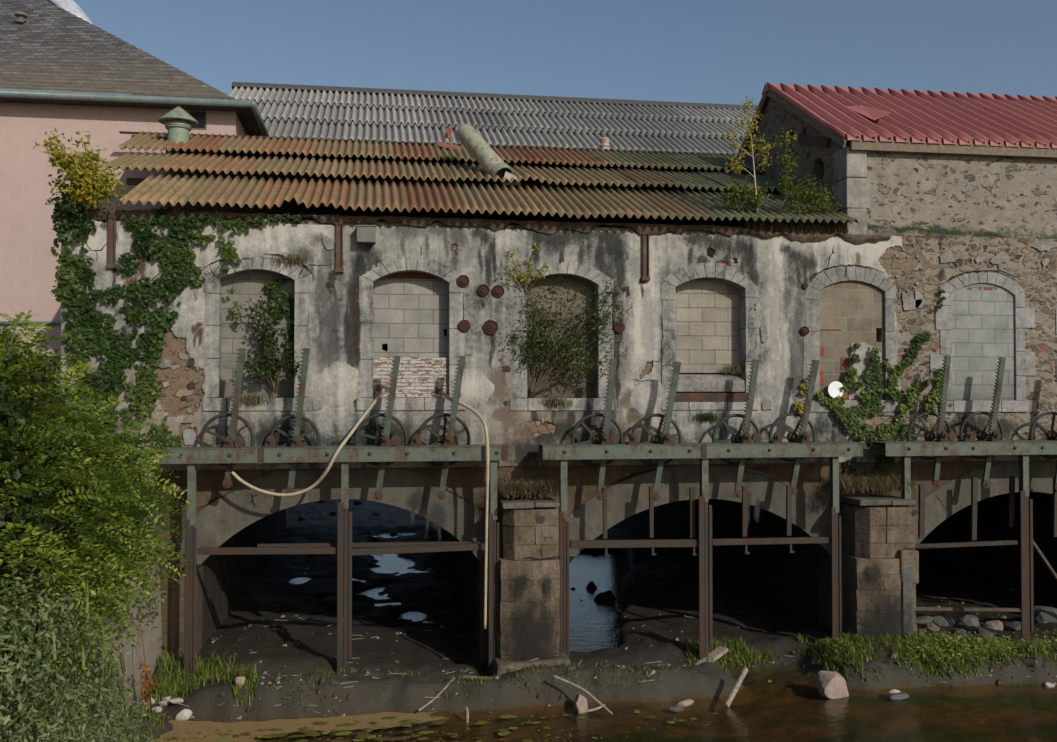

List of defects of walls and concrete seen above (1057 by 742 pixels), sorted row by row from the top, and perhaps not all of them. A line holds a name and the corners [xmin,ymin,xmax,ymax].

damp [298,234,382,368]
damp [686,234,759,299]
spalling [155,327,205,440]